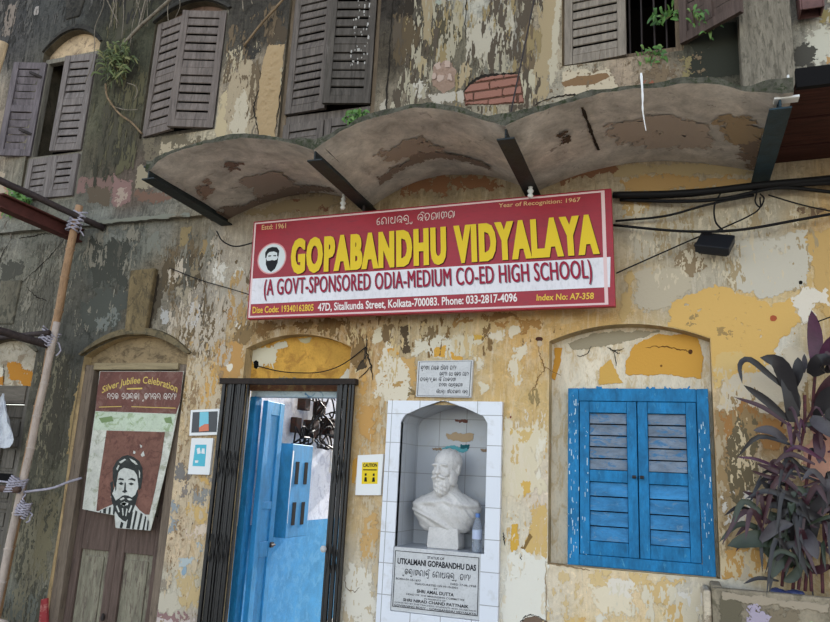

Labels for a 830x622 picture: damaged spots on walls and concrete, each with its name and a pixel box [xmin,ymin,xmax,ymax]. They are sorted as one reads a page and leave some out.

damp [0,0,49,71]
damp [87,0,208,208]
flaking render [210,42,263,140]
damp [223,2,287,119]
damp [373,135,491,186]
peeling [379,0,618,115]
peeling [620,173,752,191]
crack [0,233,64,301]
peeling [0,212,288,622]
flaking render [340,316,703,622]
crack [530,346,560,392]
peeling [596,202,830,583]